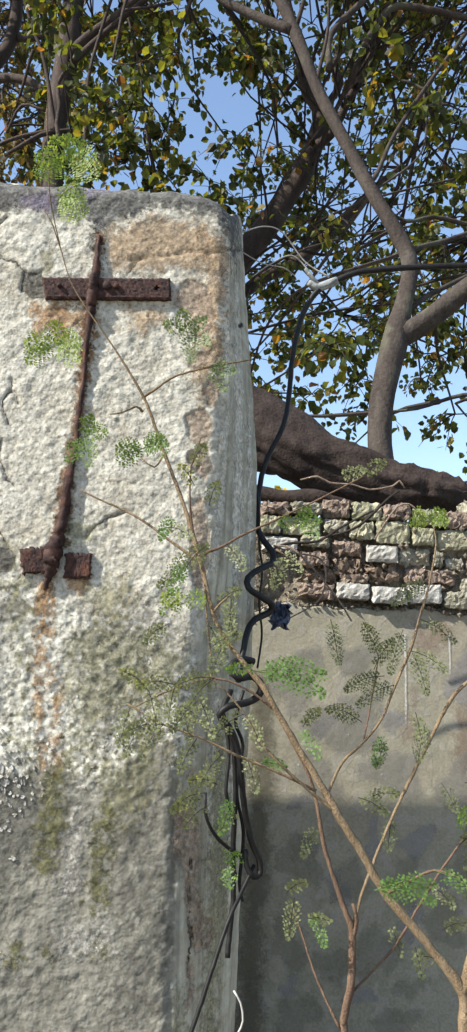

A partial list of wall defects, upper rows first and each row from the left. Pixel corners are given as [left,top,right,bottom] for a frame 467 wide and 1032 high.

crack [0,381,18,487]
rust [27,300,99,548]
water stain [443,633,467,704]